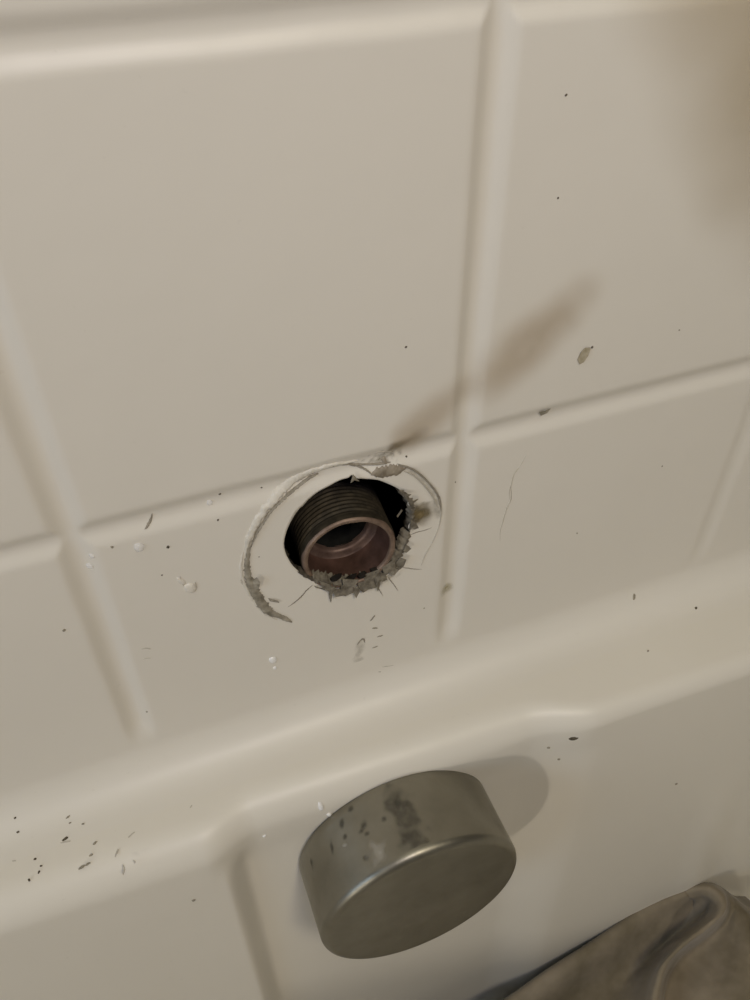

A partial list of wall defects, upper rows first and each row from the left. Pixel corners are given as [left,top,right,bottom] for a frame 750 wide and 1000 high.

spalling [297,488,419,601]